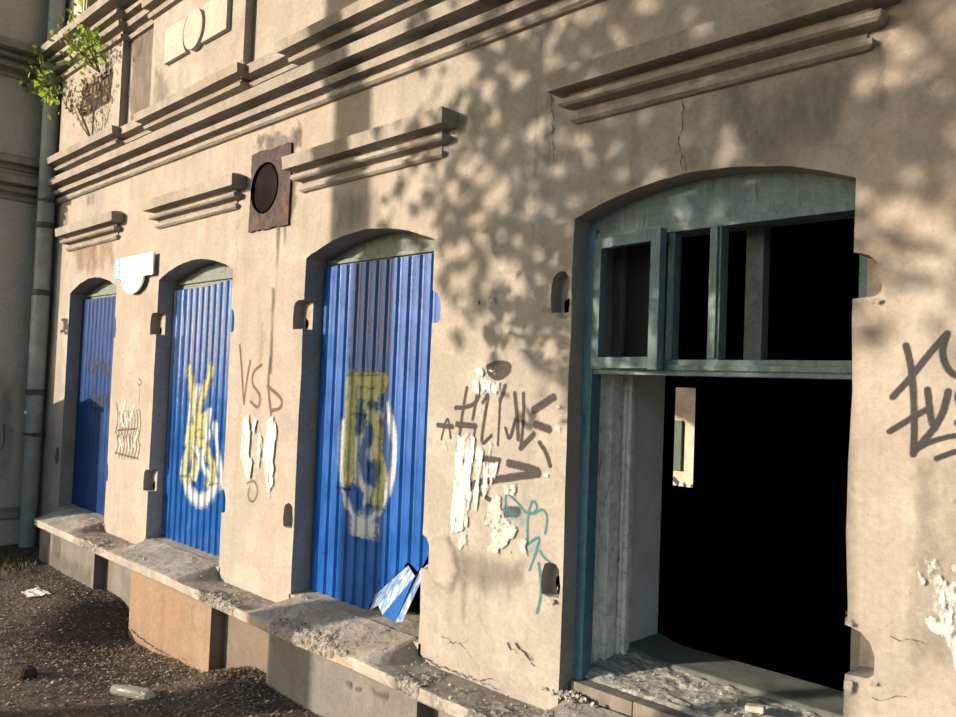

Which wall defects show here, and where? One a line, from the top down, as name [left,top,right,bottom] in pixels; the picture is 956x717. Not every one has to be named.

peeling [481,484,527,555]
peeling [918,559,956,670]
spalling [269,618,347,658]
spalling [386,671,434,699]
spalling [843,680,853,695]
spalling [464,700,516,717]